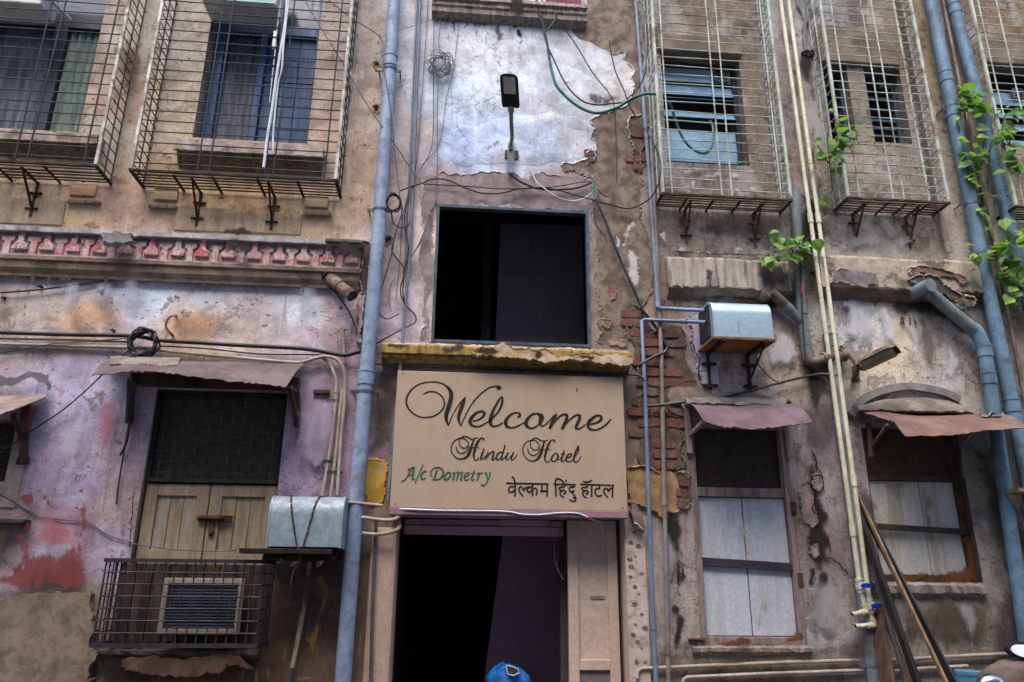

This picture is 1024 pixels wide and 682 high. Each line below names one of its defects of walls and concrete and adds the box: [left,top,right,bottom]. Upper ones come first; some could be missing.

flaking render [907,265,977,312]
flaking render [418,0,723,664]
peeling [21,493,51,507]
flaking render [797,473,823,529]
flaking render [808,543,820,559]
corrosion [894,492,978,582]
peeling [0,506,99,682]